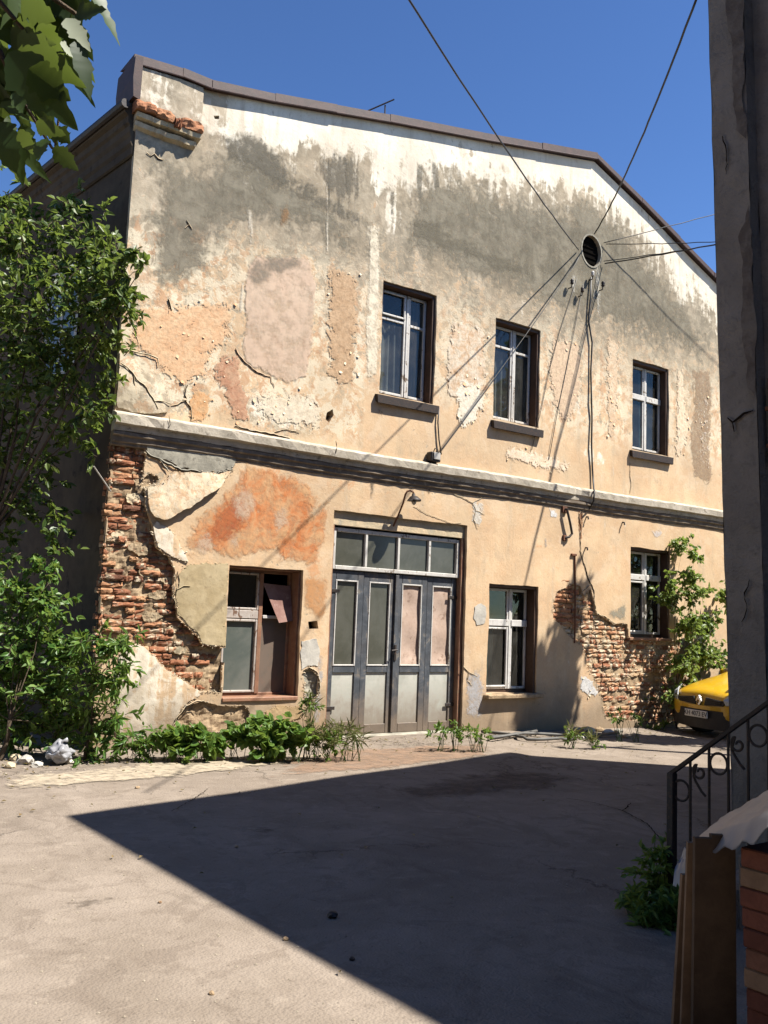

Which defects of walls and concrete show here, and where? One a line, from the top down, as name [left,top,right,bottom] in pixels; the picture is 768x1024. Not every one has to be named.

leakage [149,136,380,382]
leakage [409,163,698,357]
crack [120,332,193,427]
peeling [128,300,327,428]
crack [235,348,275,387]
peeling [325,267,362,387]
peeling [446,320,489,428]
peeling [506,447,571,473]
spalling [92,433,251,733]
spalling [553,580,691,723]